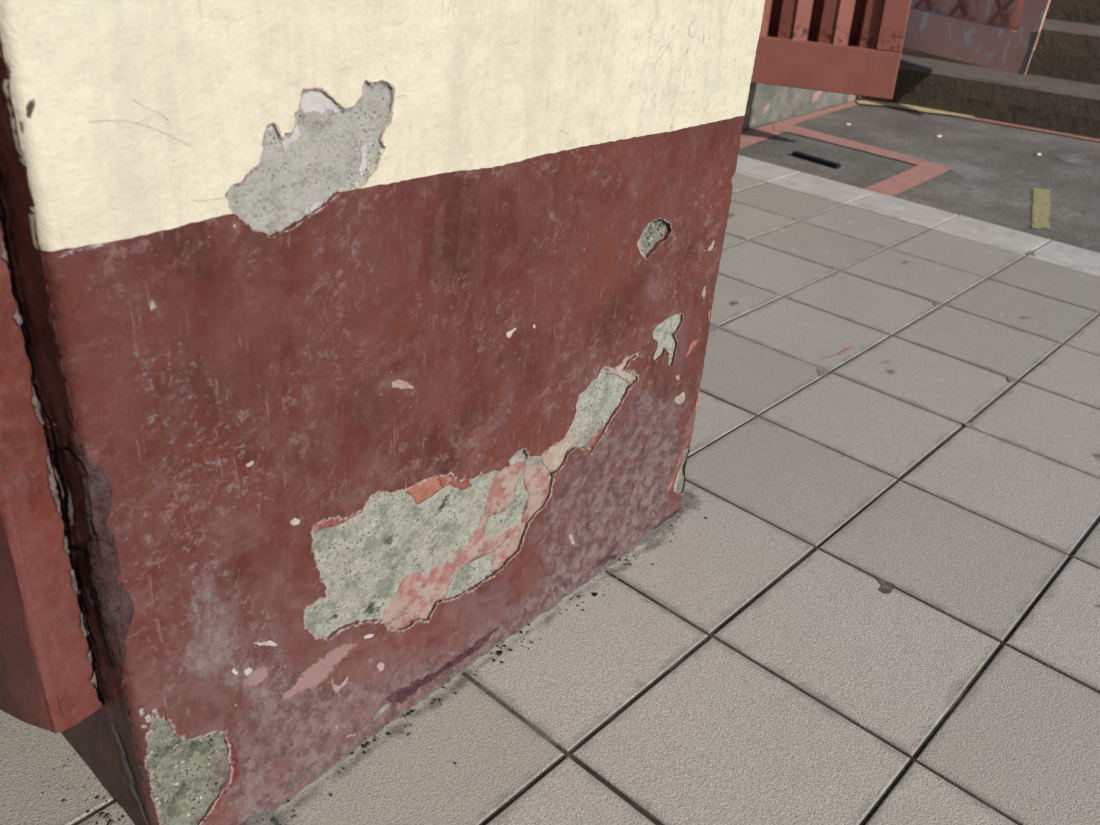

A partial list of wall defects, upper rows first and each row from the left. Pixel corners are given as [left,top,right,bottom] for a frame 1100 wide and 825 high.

spalling [225,80,396,238]
spalling [637,218,672,260]
spalling [653,313,699,380]
peeling [675,389,700,413]
spalling [667,426,694,495]
spalling [282,352,639,704]
spalling [139,708,240,825]